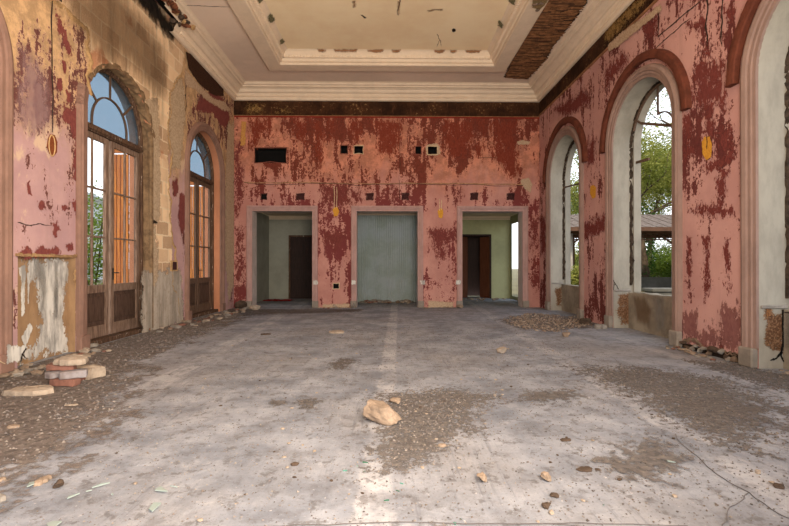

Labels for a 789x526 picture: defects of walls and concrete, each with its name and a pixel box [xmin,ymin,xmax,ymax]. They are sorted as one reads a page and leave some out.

peeling [602,0,662,93]
peeling [17,220,74,263]
flaking render [49,0,231,333]
spalling [234,101,294,301]
peeling [340,117,408,162]
spalling [415,143,441,156]
peeling [427,225,457,260]
peeling [469,118,532,192]
peeling [528,213,546,293]
peeling [682,11,738,220]
peeling [679,234,741,363]
crack [675,434,789,526]